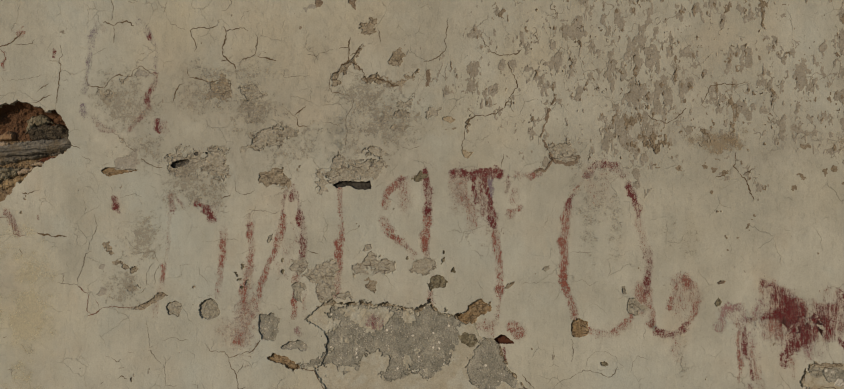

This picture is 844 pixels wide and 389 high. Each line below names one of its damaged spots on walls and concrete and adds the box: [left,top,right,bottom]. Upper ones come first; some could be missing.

crack [0,32,63,103]
spalling [0,95,69,146]
crack [97,0,137,53]
spalling [165,73,301,189]
crack [165,0,305,101]
spalling [314,145,390,195]
crack [308,32,399,147]
peeling [332,0,844,201]
crack [0,216,159,316]
crack [206,340,260,389]
spalling [258,312,308,352]
spalling [281,244,528,389]